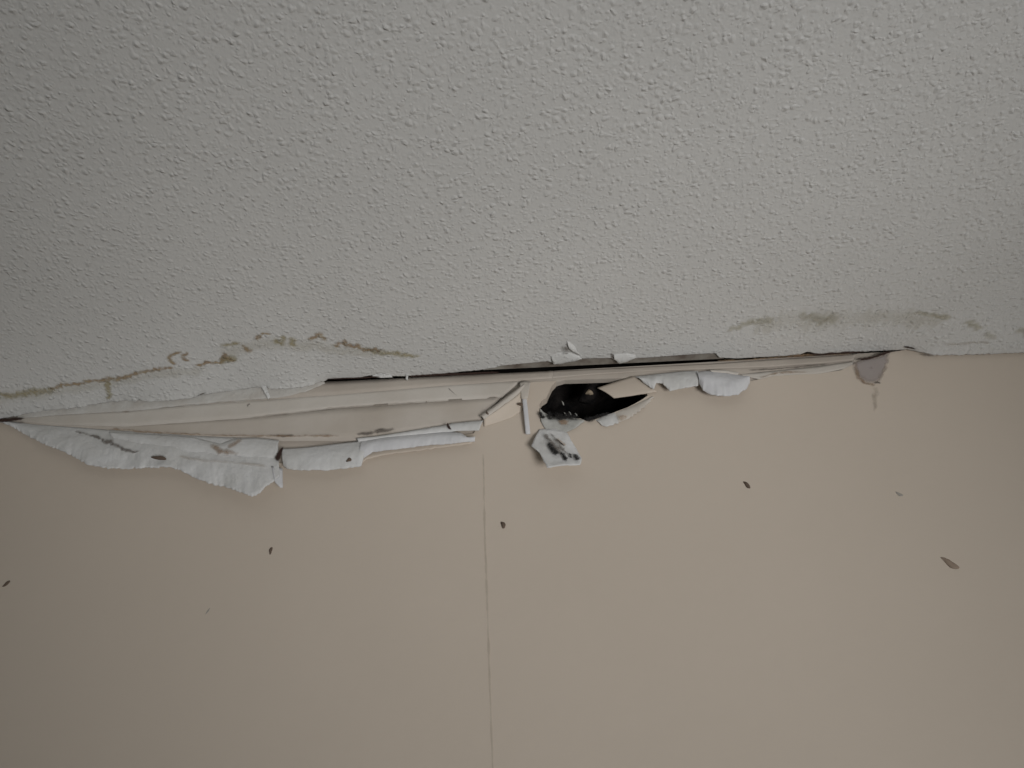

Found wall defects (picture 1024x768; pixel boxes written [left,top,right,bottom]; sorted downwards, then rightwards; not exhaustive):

damp [1,333,295,399]
damp [309,334,413,357]
crack [332,341,930,380]
peeling [0,349,906,497]